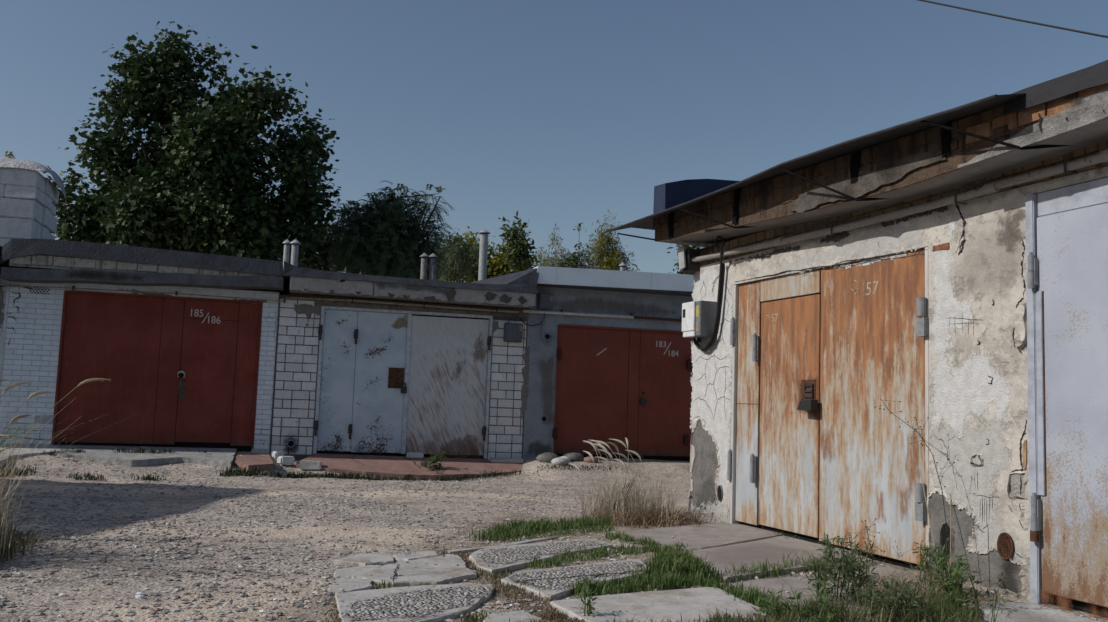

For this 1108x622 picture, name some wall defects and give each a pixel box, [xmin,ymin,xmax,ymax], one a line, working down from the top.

peeling [688,267,735,518]
crack [695,243,928,422]
peeling [777,216,1029,600]
rust [901,432,919,513]
crack [952,203,966,255]
crack [949,237,1027,354]